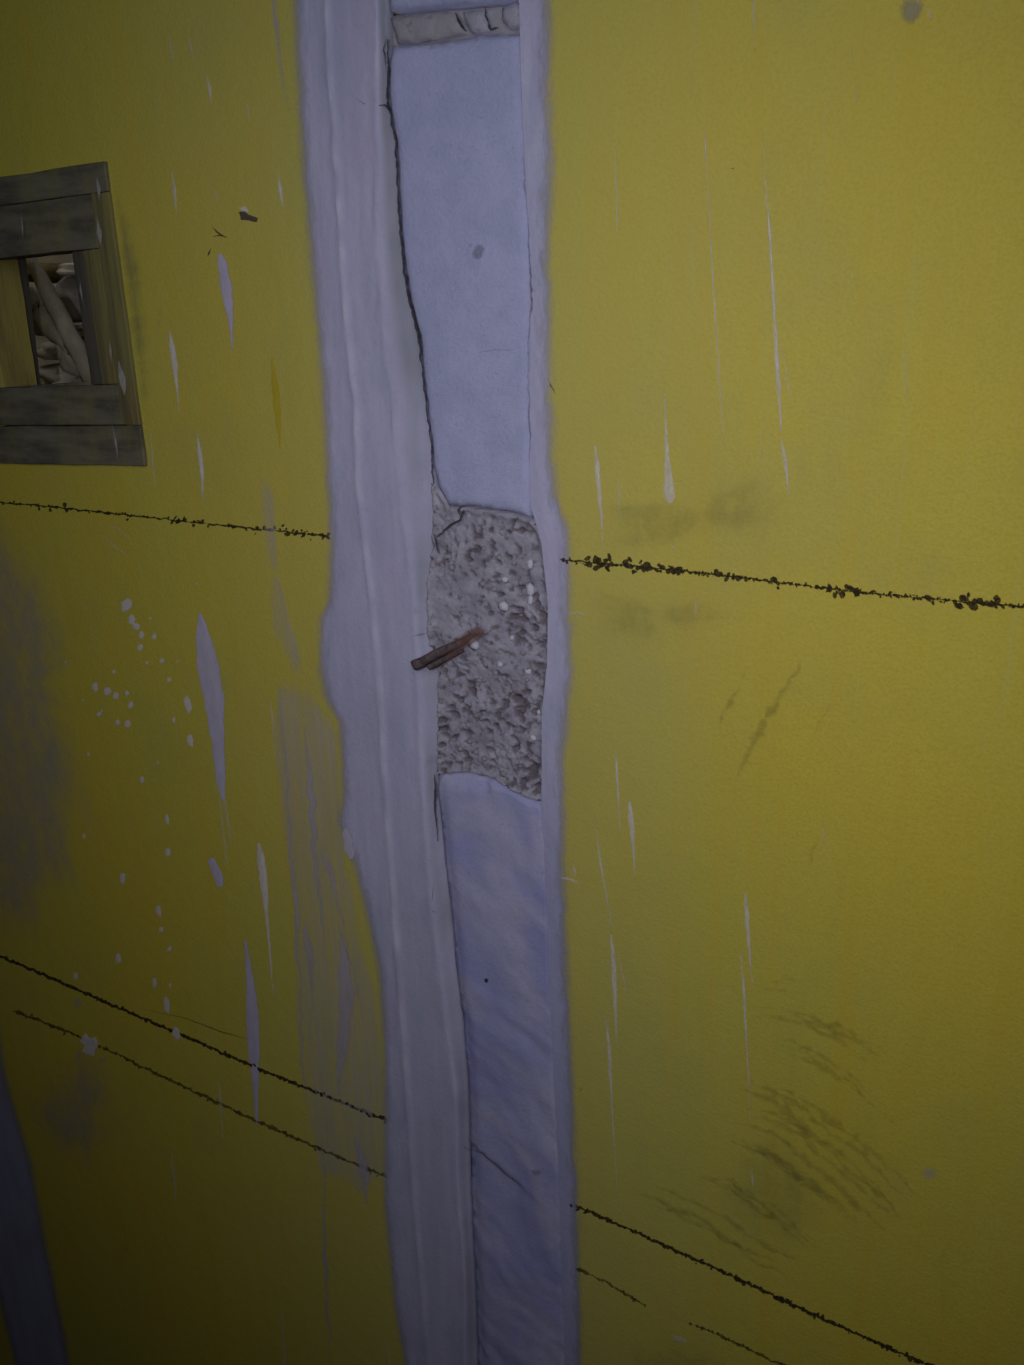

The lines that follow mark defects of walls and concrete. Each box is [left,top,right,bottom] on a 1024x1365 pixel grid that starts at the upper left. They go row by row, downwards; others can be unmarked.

crack [379,39,434,484]
crack [434,506,464,554]
spalling [426,483,548,801]
water stain [740,957,749,1085]